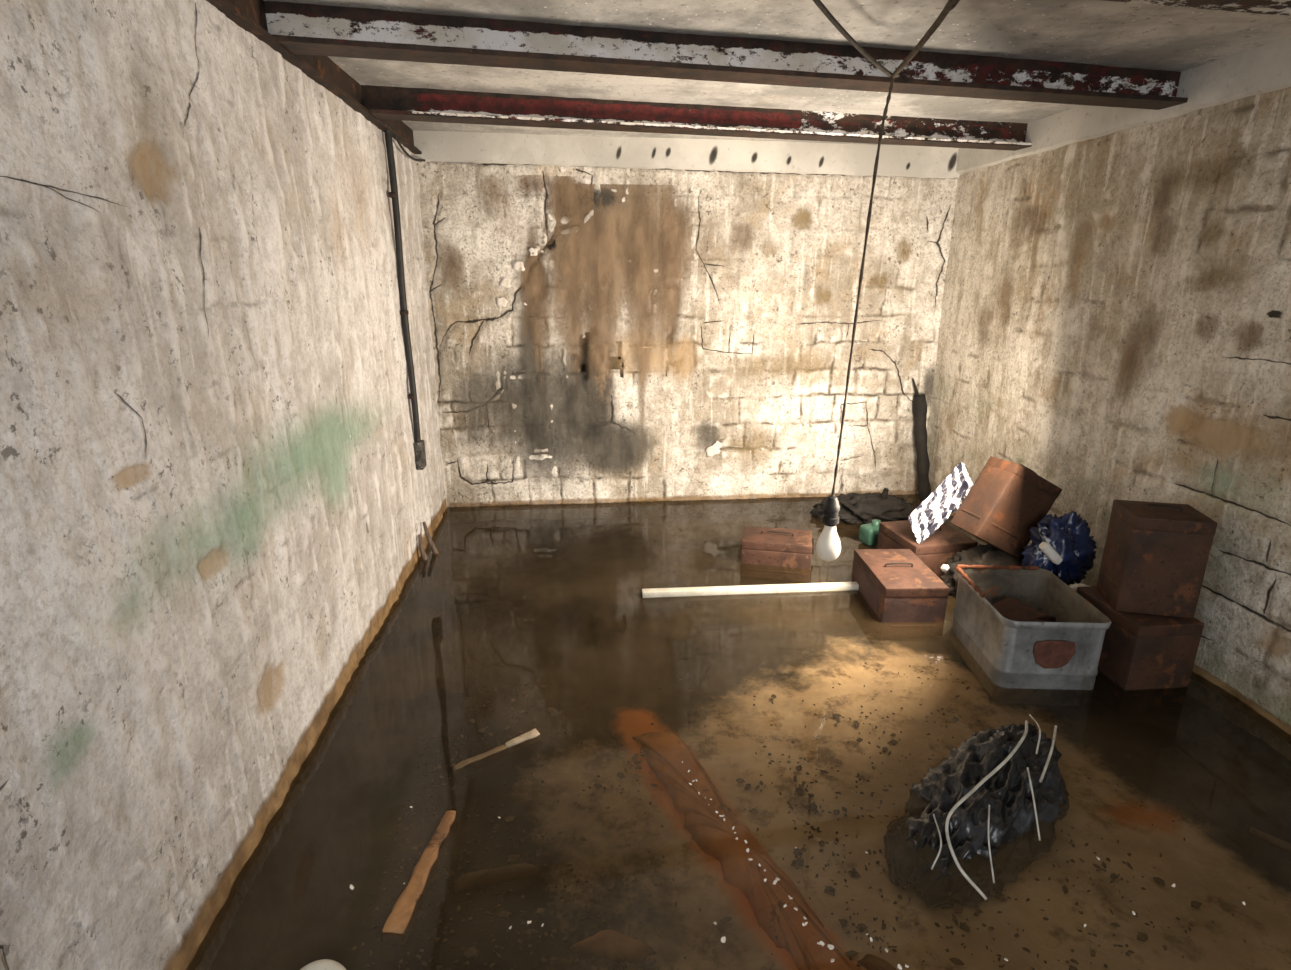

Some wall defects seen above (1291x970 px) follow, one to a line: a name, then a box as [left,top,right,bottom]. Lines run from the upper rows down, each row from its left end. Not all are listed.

crack [429,193,523,428]
crack [469,162,593,256]
water stain [466,184,692,472]
crack [1226,357,1291,365]